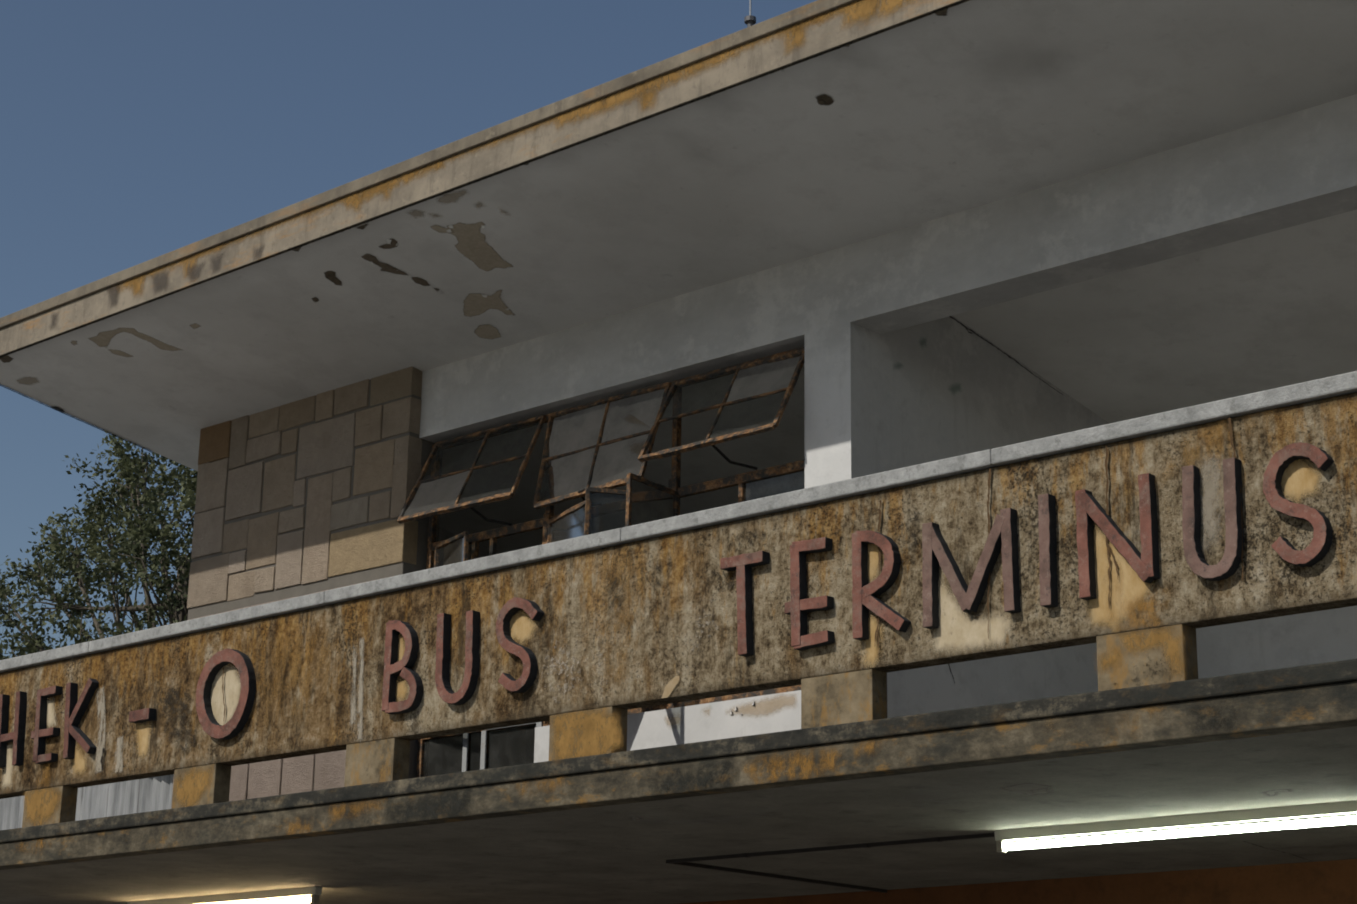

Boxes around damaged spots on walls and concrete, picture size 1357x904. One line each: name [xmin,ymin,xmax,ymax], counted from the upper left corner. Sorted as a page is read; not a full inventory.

corrosion [117,0,910,294]
peeling [362,238,439,291]
peeling [409,191,513,271]
peeling [72,328,181,357]
peeling [463,290,515,339]
damp [865,618,881,664]
damp [96,688,123,772]
damp [158,685,200,754]
efflorescence [351,639,364,739]